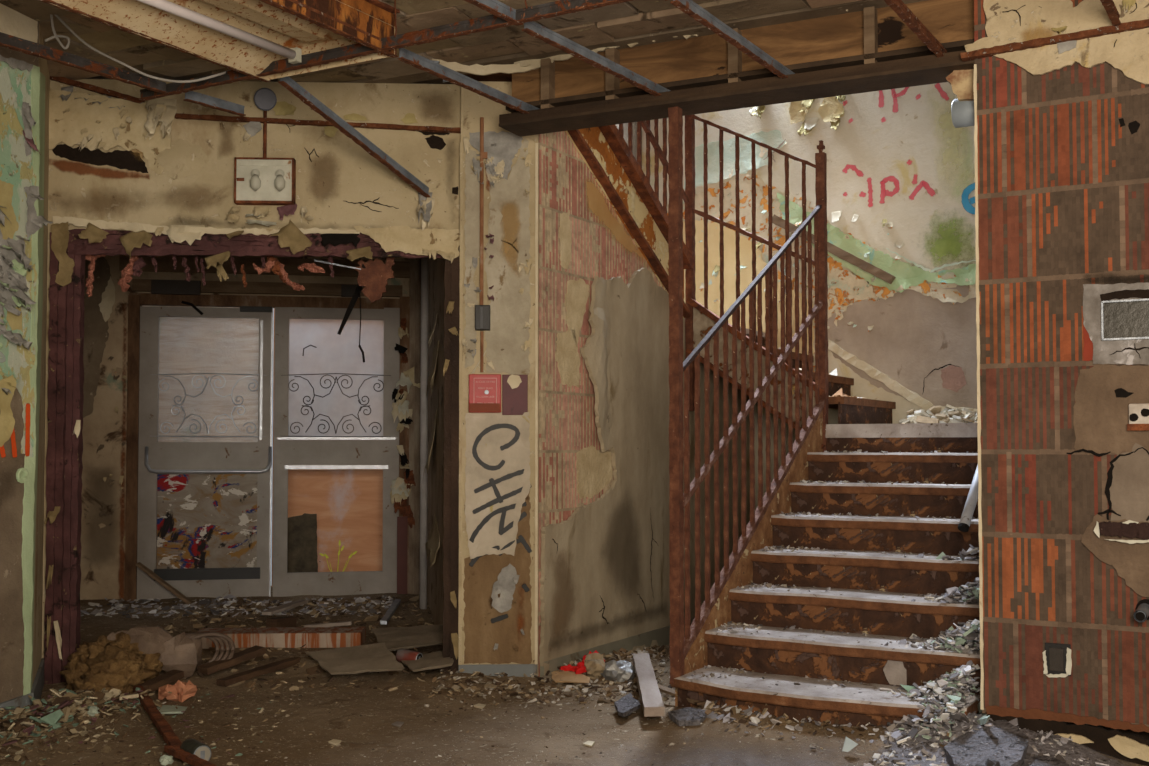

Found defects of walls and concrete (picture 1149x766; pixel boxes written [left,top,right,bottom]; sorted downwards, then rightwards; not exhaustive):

peeling [965,0,1149,85]
flaking render [683,95,977,409]
water stain [928,219,973,262]
peeling [0,55,533,695]
spalling [1114,388,1133,398]
peeling [450,267,750,675]
crack [1067,447,1149,521]
spalling [986,705,1149,762]